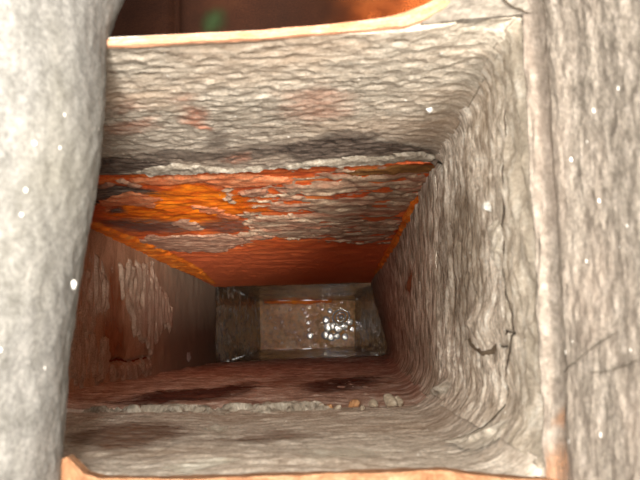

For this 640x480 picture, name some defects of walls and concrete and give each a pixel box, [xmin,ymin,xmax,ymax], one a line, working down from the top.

peeling [97,151,437,211]
rust [109,184,266,226]
peeling [190,205,240,220]
peeling [140,219,254,254]
spalling [373,196,420,278]
peeling [69,252,173,389]
crack [453,165,516,439]
water stain [307,377,376,392]
crack [563,333,616,373]
crack [590,360,640,373]